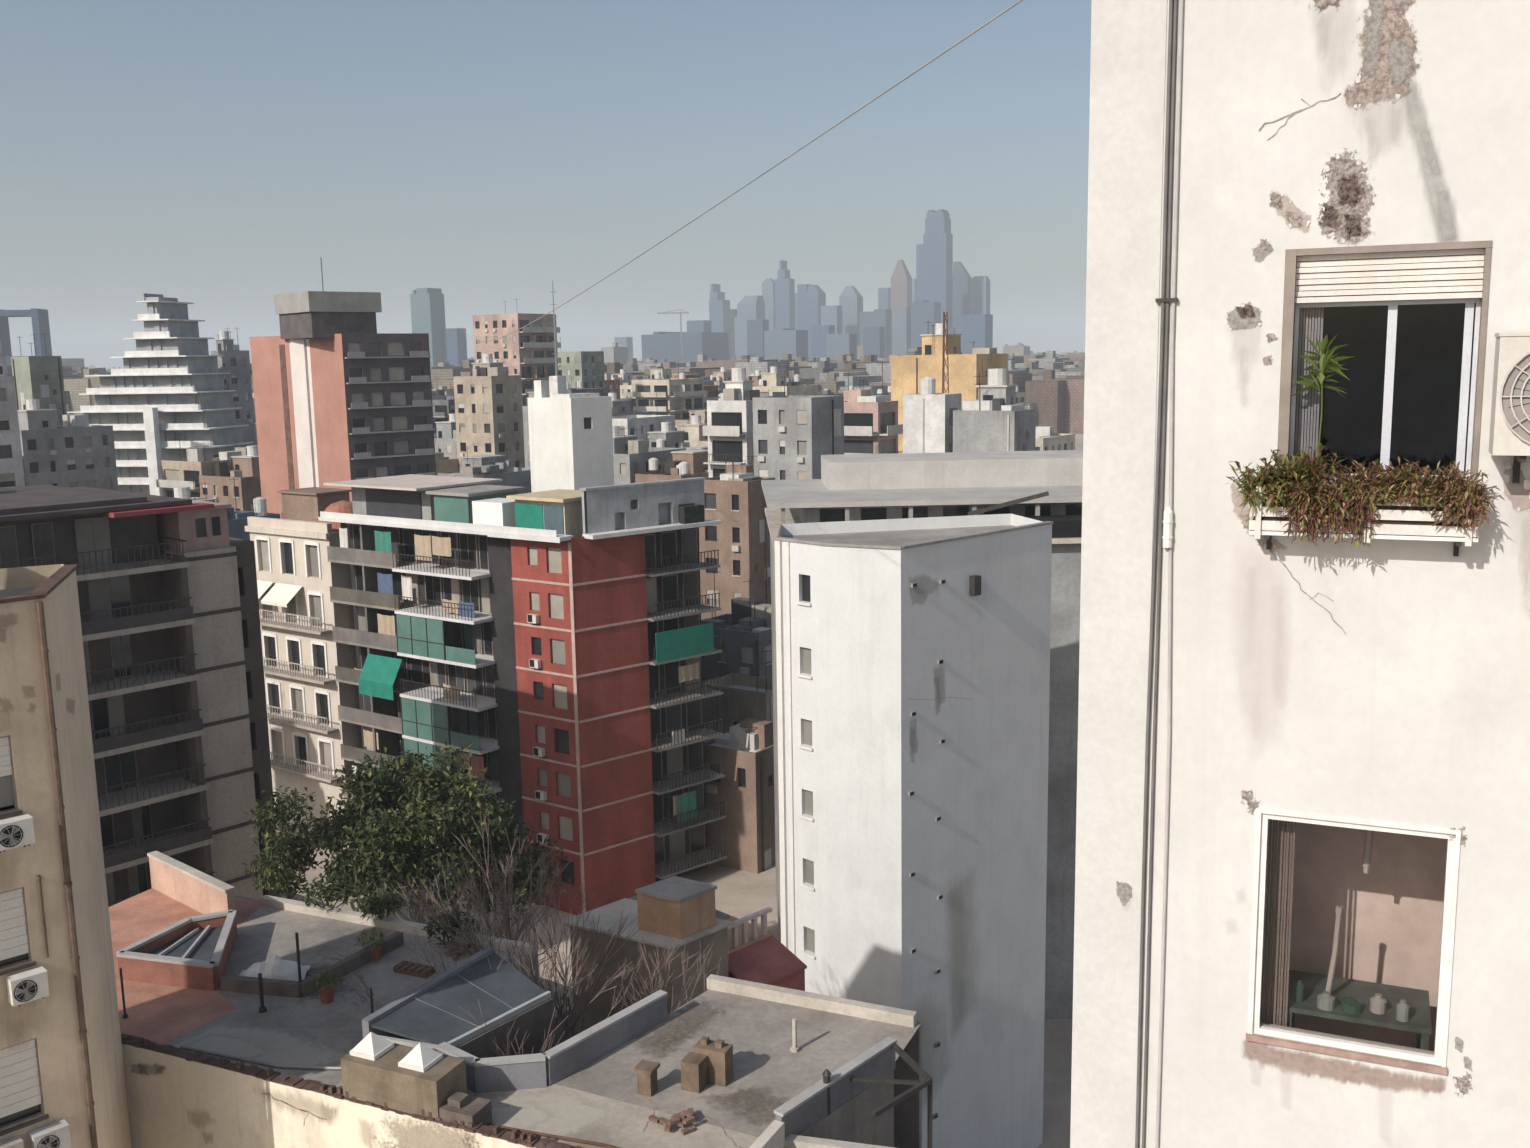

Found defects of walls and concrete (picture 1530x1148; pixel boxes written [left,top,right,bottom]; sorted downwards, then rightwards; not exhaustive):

flaking render [1314,0,1340,12]
flaking render [1344,0,1420,109]
crack [1258,92,1341,140]
leakage [1406,83,1456,242]
peeling [1269,148,1376,246]
peeling [1252,239,1273,262]
flaking render [1225,302,1278,365]
flaking render [1240,790,1261,815]
flaking render [1116,881,1132,906]